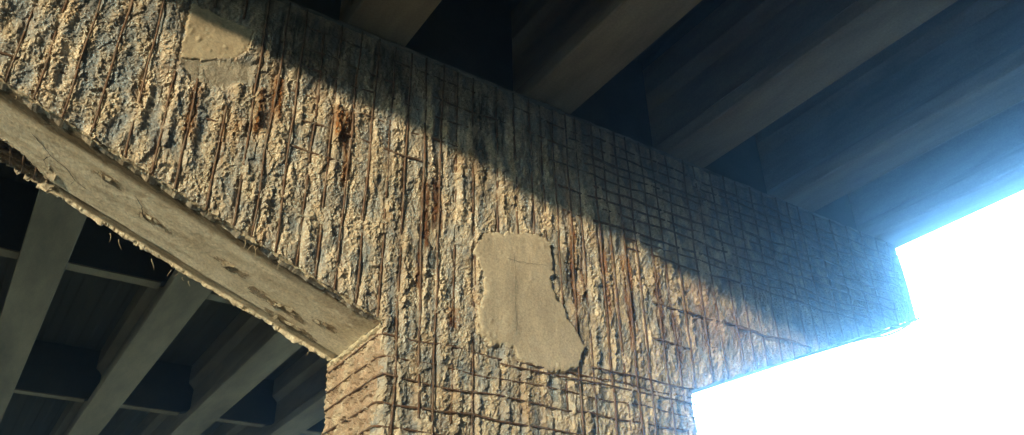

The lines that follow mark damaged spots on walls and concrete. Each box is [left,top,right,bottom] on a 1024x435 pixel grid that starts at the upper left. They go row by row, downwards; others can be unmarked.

corrosion [253,78,283,135]
spalling [0,138,58,191]
peeling [93,171,121,191]
corrosion [333,107,350,179]
peeling [139,212,168,233]
peeling [214,257,335,342]
spalling [322,331,396,435]